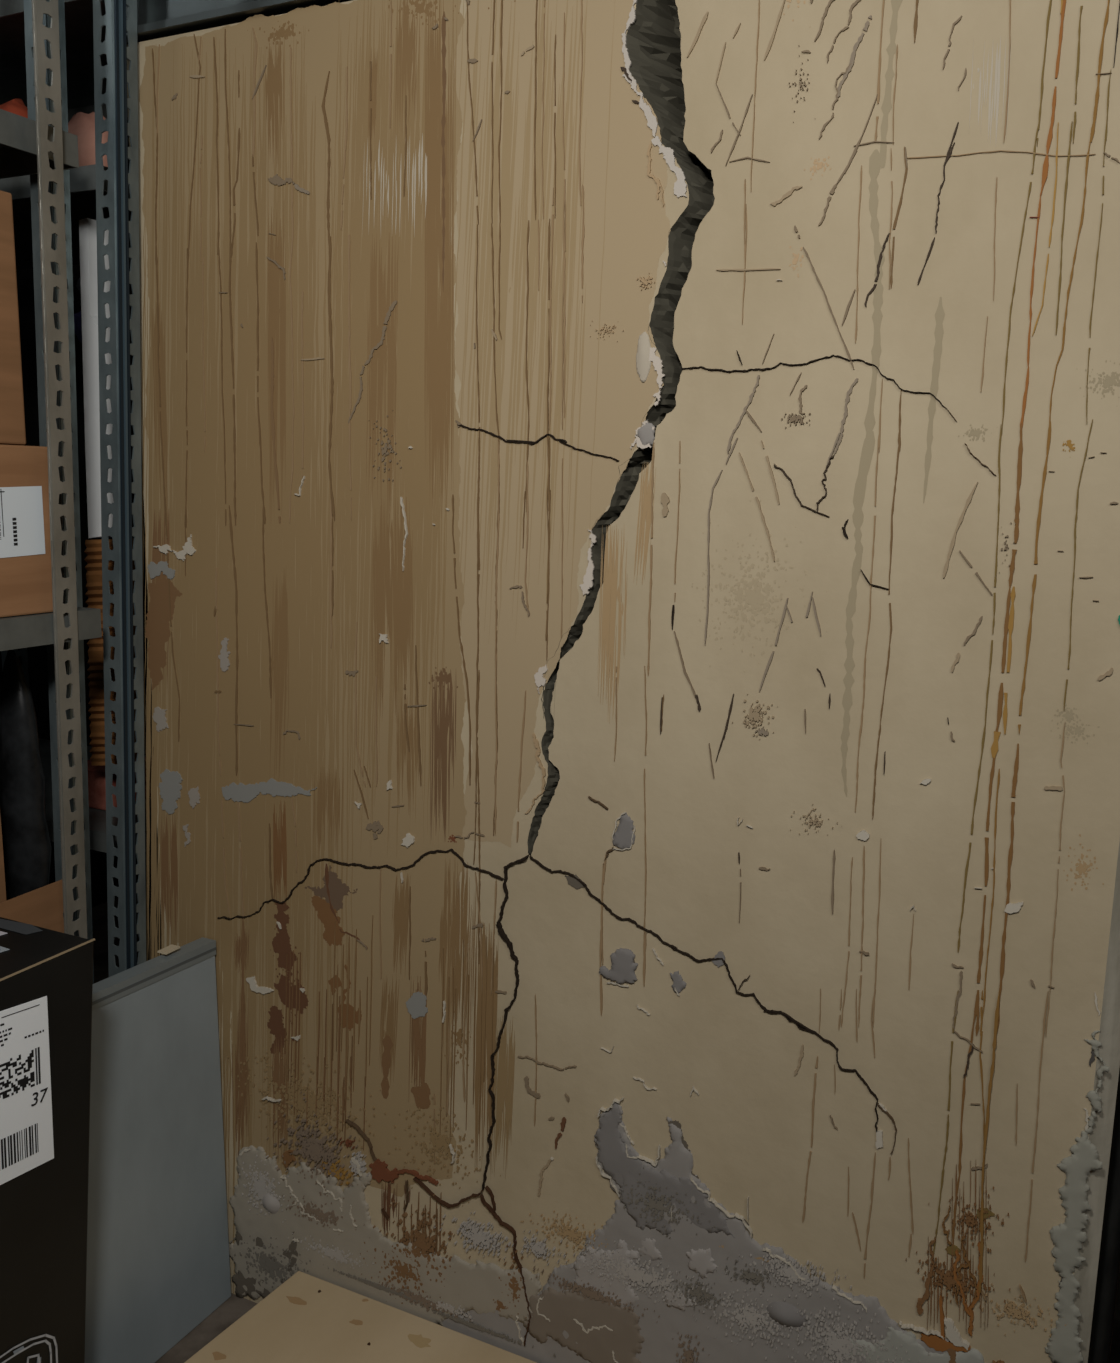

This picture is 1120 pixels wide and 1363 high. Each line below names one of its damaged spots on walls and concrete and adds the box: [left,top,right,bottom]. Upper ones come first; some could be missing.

damp [969,0,1012,144]
damp [923,297,945,503]
damp [138,0,930,1363]
crack [218,0,995,1346]
rust [905,0,1120,1363]
rust [267,800,455,1304]
spalling [229,1097,984,1363]
spalling [1045,992,1109,1363]